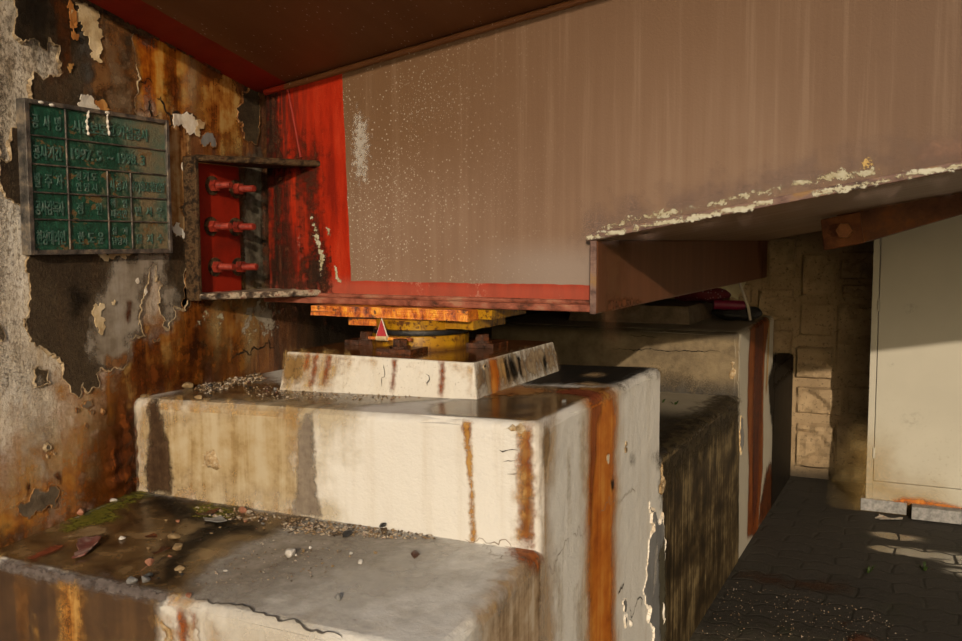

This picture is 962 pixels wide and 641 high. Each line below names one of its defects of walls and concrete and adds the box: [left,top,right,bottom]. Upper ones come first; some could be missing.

peeling [12,0,141,116]
peeling [0,118,20,206]
rust [132,34,242,237]
peeling [172,111,217,149]
rust [259,93,331,293]
peeling [586,157,962,240]
peeling [23,203,191,429]
rust [463,422,476,542]
rust [469,344,616,641]
rust [747,317,772,537]
crack [192,599,342,641]
peeling [643,502,667,641]